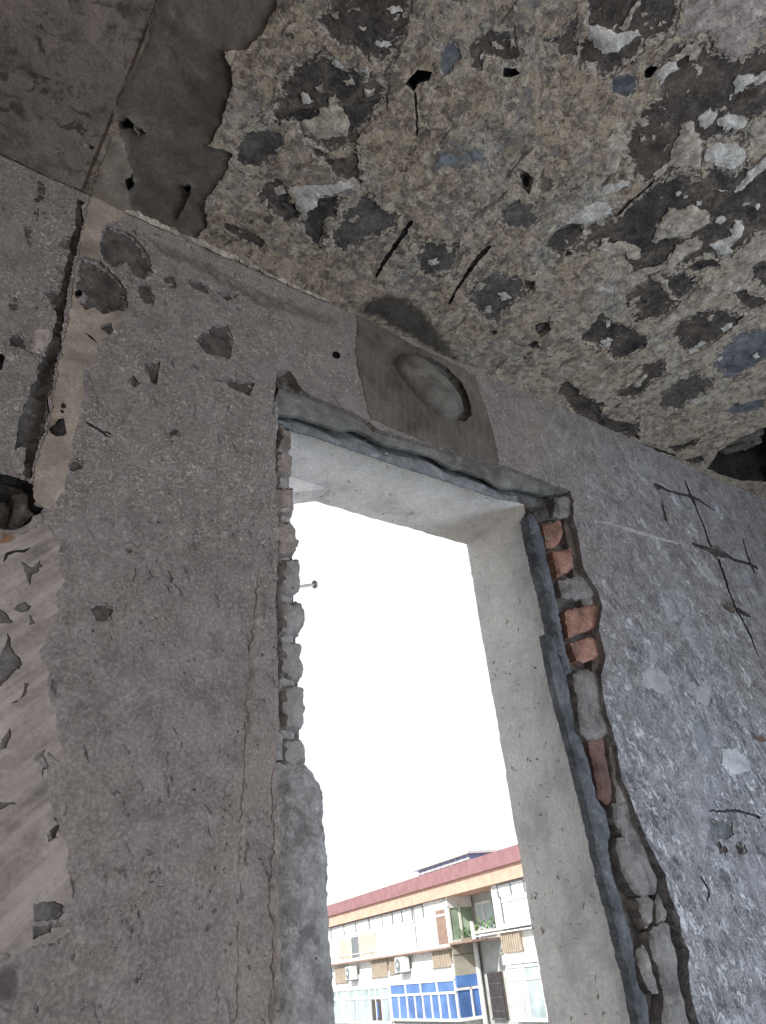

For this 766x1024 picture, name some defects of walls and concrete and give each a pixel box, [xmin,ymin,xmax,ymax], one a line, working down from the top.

peeling [466,25,524,72]
peeling [250,0,413,252]
crack [412,92,420,136]
crack [375,220,413,278]
crack [448,245,492,305]
peeling [466,270,538,325]
peeling [540,0,766,441]
spalling [195,325,233,360]
spalling [666,427,766,482]
spalling [0,474,44,530]
crack [654,481,758,655]
flaking render [272,376,689,1024]